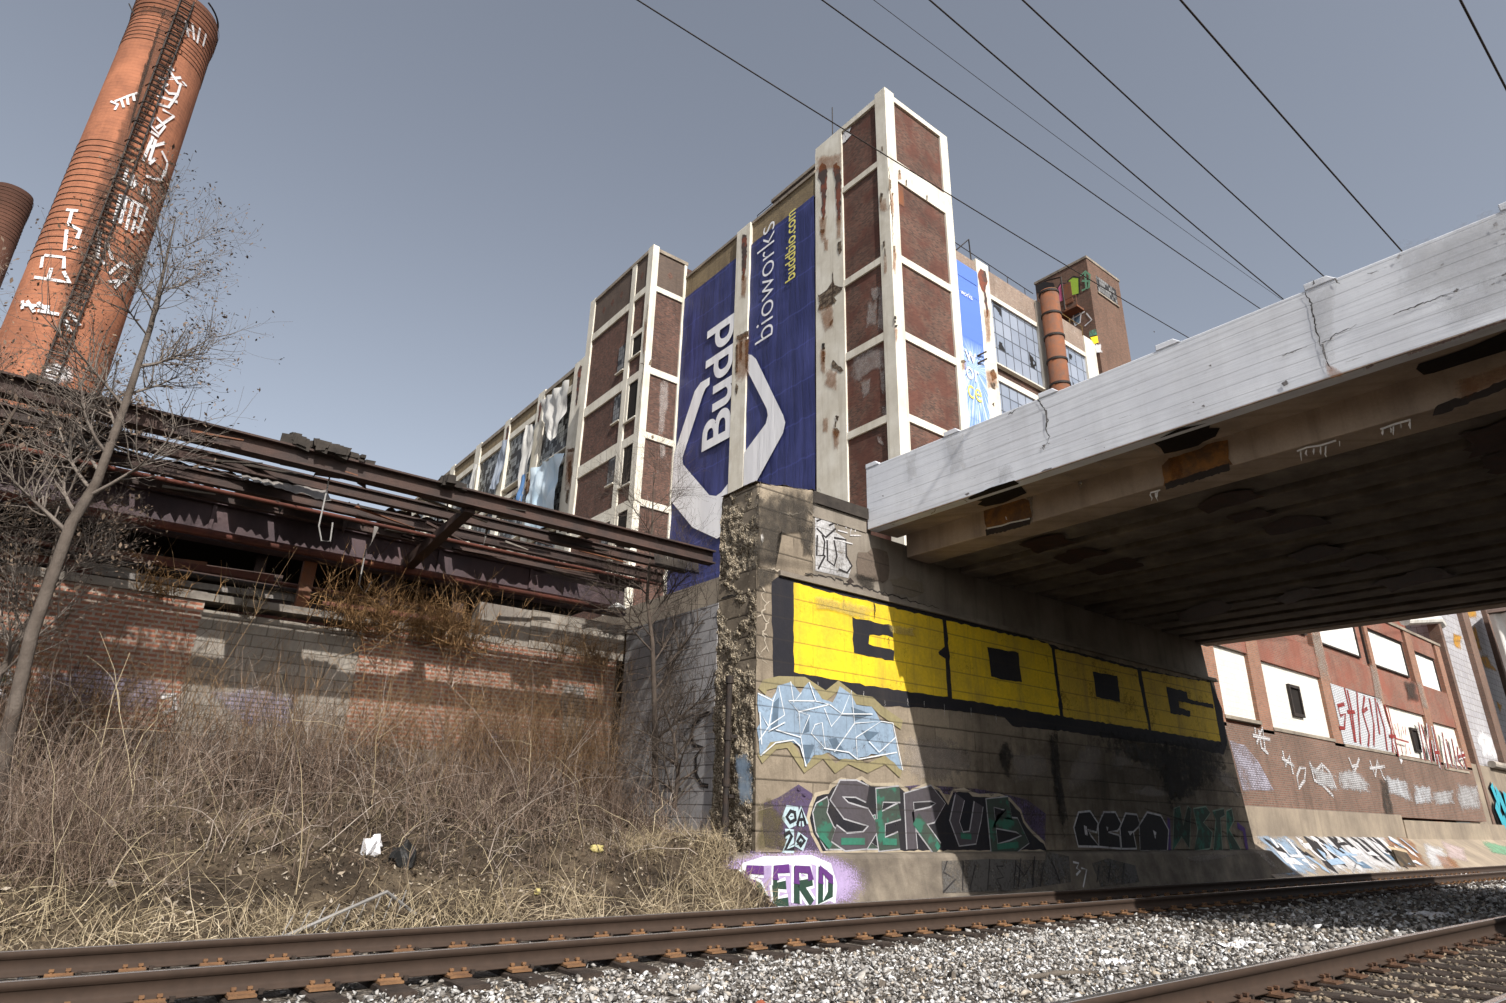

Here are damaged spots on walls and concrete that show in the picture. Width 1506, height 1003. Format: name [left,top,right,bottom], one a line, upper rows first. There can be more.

crack [1283,271,1376,376]
spalling [1408,320,1506,416]
crack [1008,400,1050,450]
spalling [1154,402,1220,454]
spalling [965,480,1026,507]